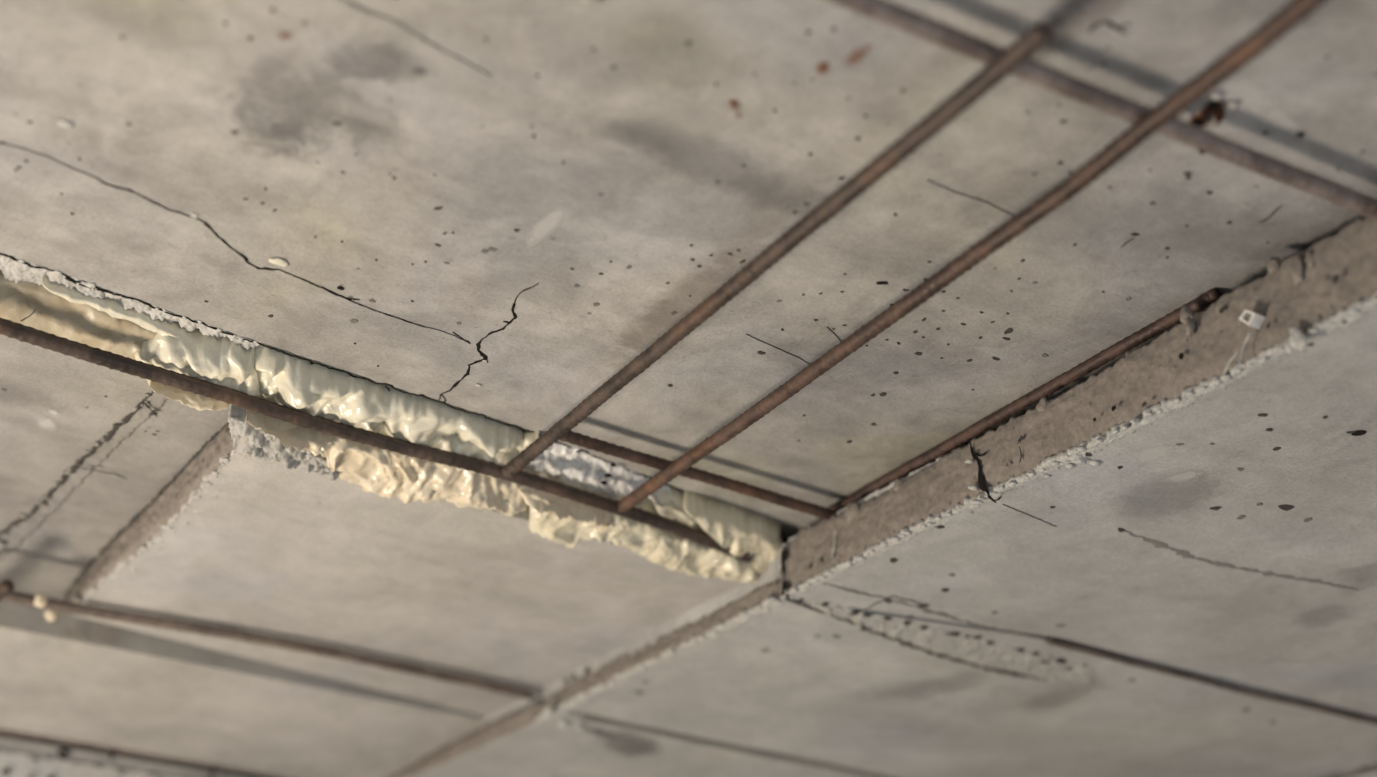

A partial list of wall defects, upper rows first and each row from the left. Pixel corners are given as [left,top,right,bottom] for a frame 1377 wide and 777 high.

crack [0,142,684,493]
spalling [0,470,533,700]
spalling [535,290,1377,725]